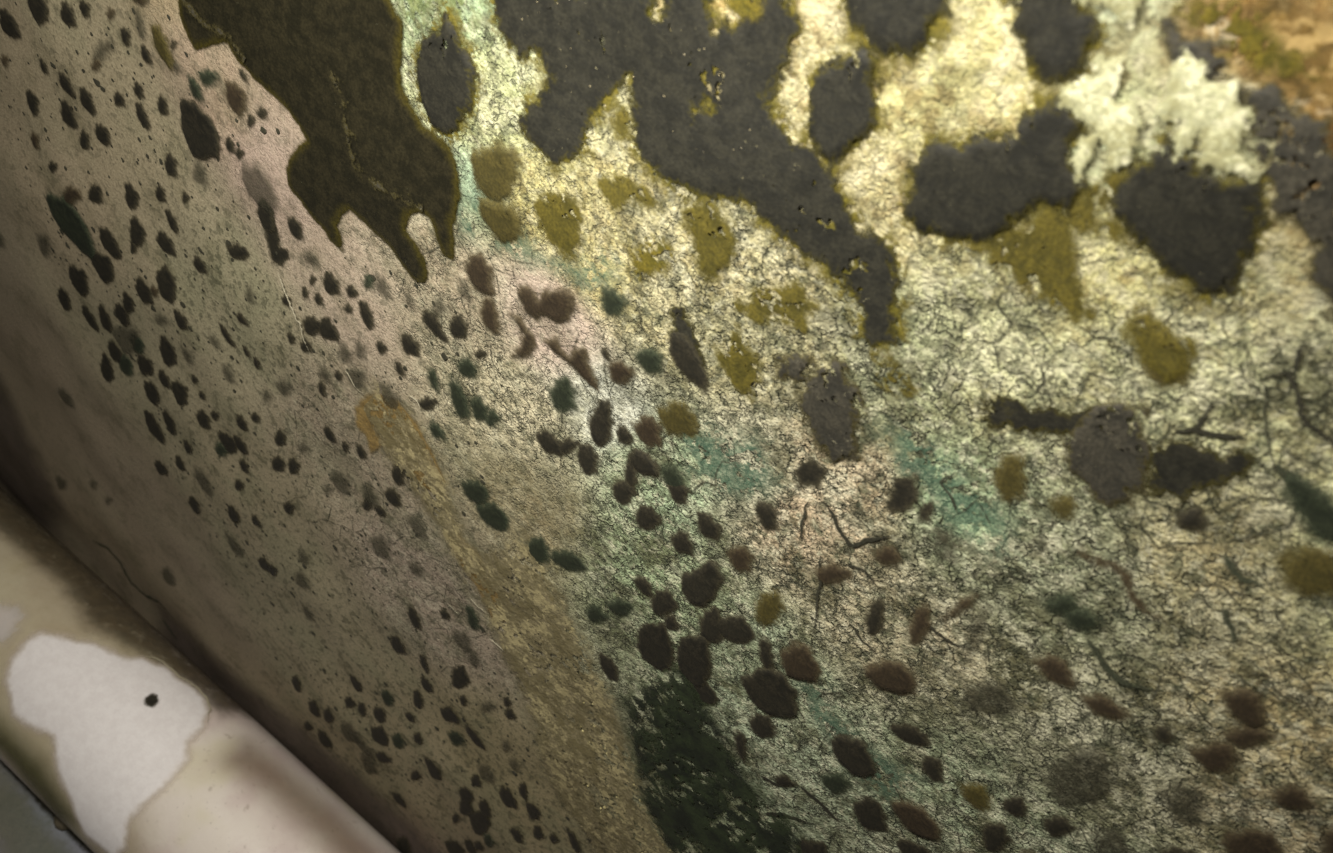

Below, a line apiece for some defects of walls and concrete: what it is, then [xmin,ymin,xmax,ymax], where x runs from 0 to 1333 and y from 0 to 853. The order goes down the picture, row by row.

water stain [470,0,1333,397]
water stain [978,392,1255,531]
water stain [885,473,954,557]
water stain [1279,471,1333,596]
water stain [864,597,885,635]
water stain [864,659,917,695]
water stain [1033,654,1129,720]
water stain [820,733,941,853]
water stain [890,722,943,782]
water stain [960,782,1032,853]
water stain [1190,688,1275,773]
water stain [1220,828,1284,853]